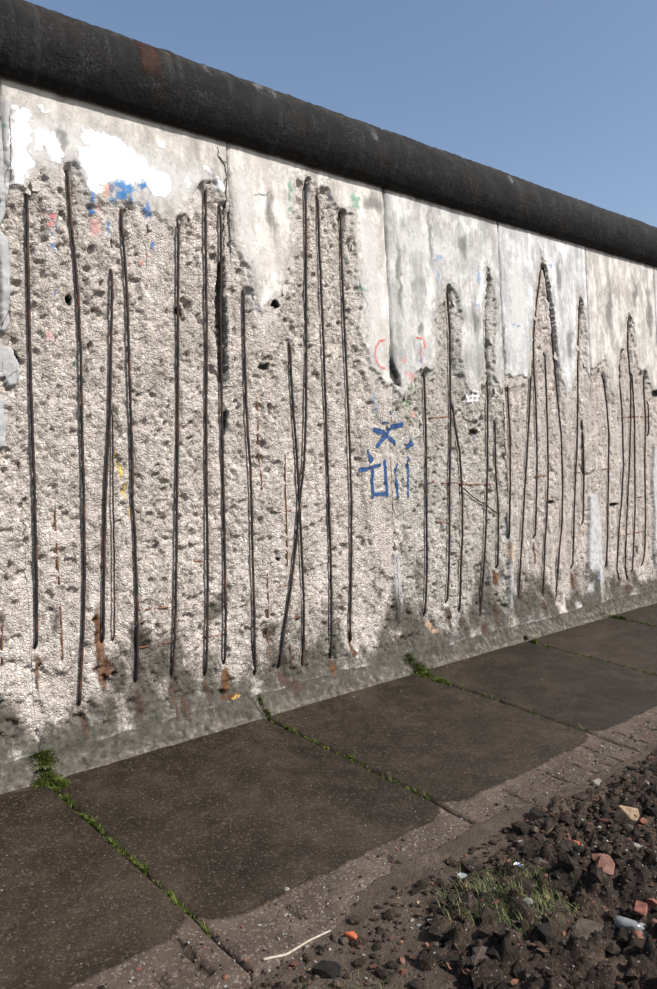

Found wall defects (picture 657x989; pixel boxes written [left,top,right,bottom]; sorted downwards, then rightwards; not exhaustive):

spalling [0,104,657,758]
corrosion [92,614,114,689]
corrosion [203,668,237,702]